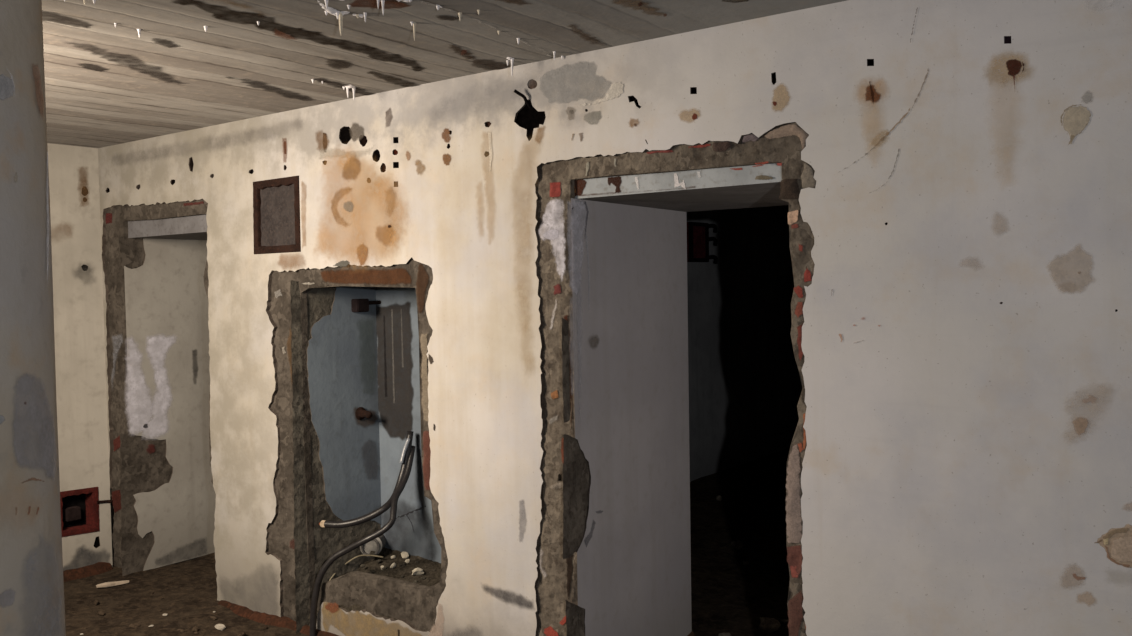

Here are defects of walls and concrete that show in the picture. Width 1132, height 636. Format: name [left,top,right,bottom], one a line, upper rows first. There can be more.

water stain [318,0,412,35]
peeling [515,62,641,141]
rust [865,81,880,102]
crack [854,70,929,178]
rust [993,57,1024,87]
spalling [94,200,208,576]
spalling [537,123,816,636]
spalling [268,259,448,636]
peeling [1095,524,1132,568]